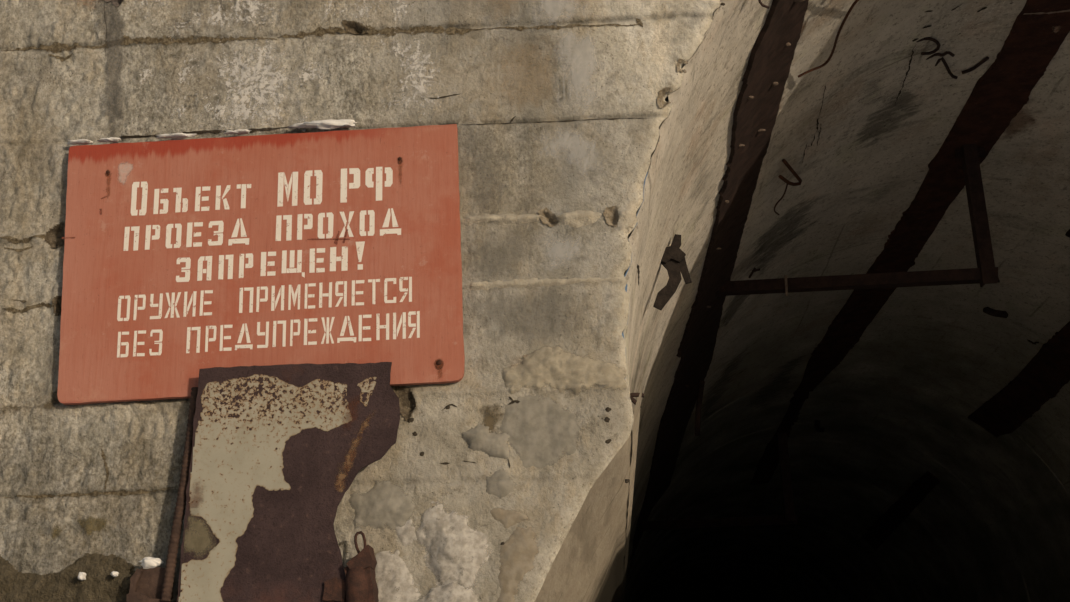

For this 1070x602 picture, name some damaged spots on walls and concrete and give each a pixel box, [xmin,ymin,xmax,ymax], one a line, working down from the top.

water stain [101,0,123,135]
efflorescence [163,0,323,138]
rust [335,415,371,492]
peeling [462,424,528,528]